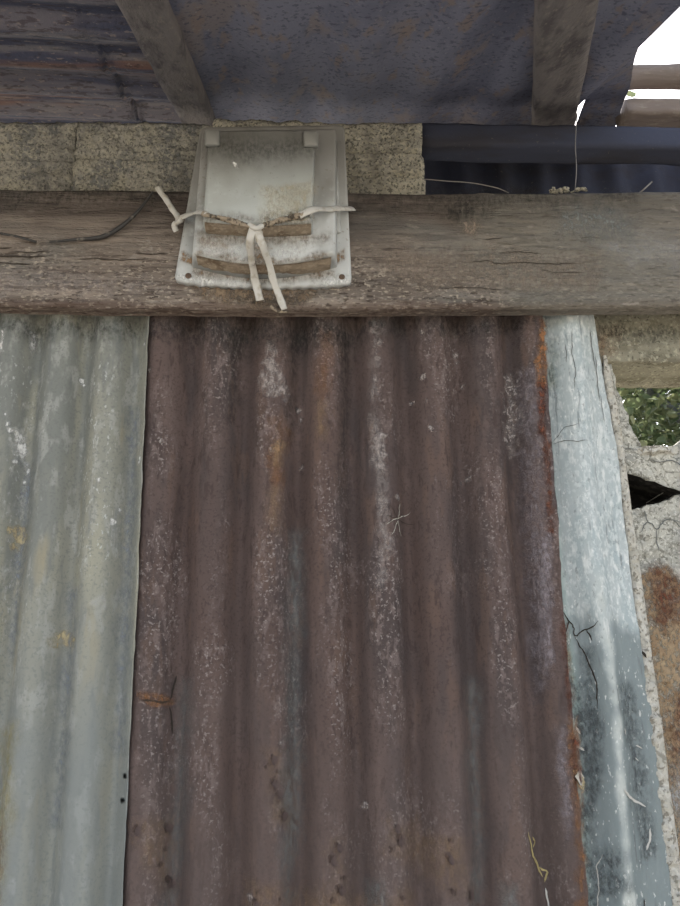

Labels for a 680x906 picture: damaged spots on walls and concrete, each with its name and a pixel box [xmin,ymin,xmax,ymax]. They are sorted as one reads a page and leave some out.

corrosion [535,323,553,533]
hole [627,474,680,510]
crack [564,613,598,706]
corrosion [641,566,680,855]